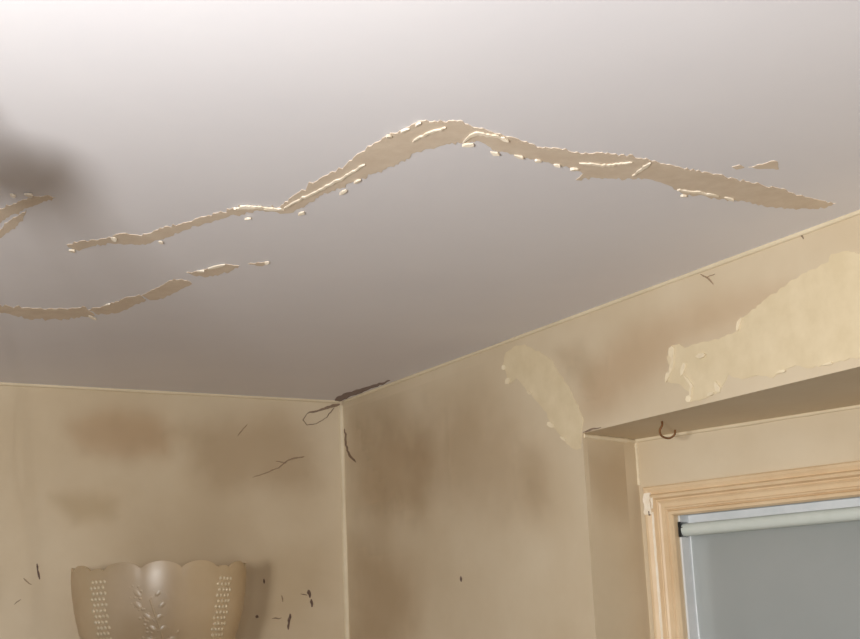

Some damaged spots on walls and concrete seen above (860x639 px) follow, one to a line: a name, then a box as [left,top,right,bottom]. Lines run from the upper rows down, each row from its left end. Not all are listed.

peeling [0,193,56,238]
peeling [67,120,835,253]
peeling [0,261,270,321]
peeling [665,251,860,402]
crack [303,380,390,462]
peeling [501,344,583,450]
crack [254,456,304,477]